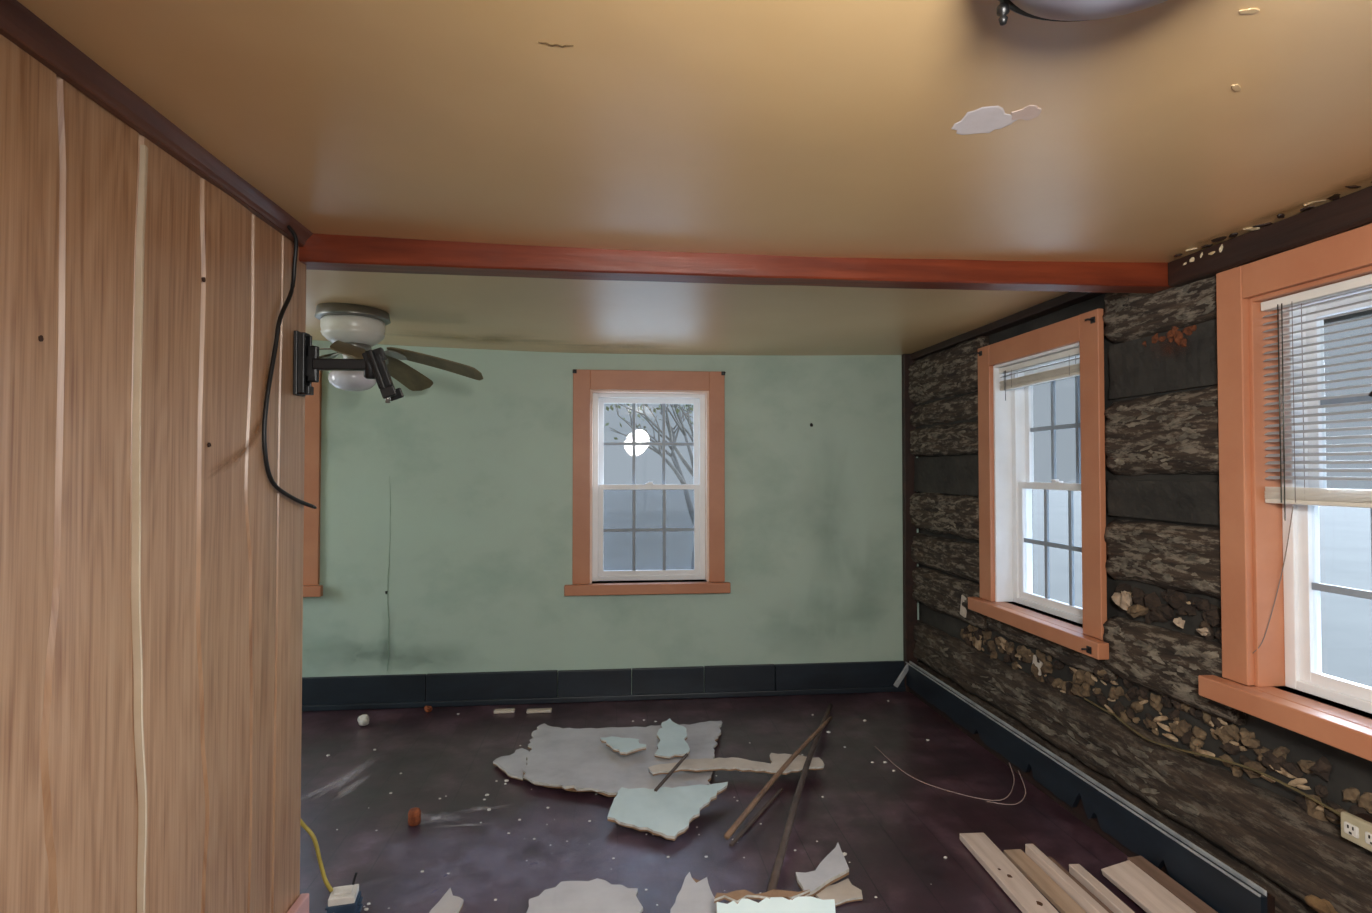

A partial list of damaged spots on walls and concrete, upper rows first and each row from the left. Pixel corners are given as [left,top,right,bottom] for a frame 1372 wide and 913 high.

peeling [951,105,1042,135]
peeling [1106,626,1219,702]
peeling [922,638,1199,817]
spalling [1304,895,1338,913]